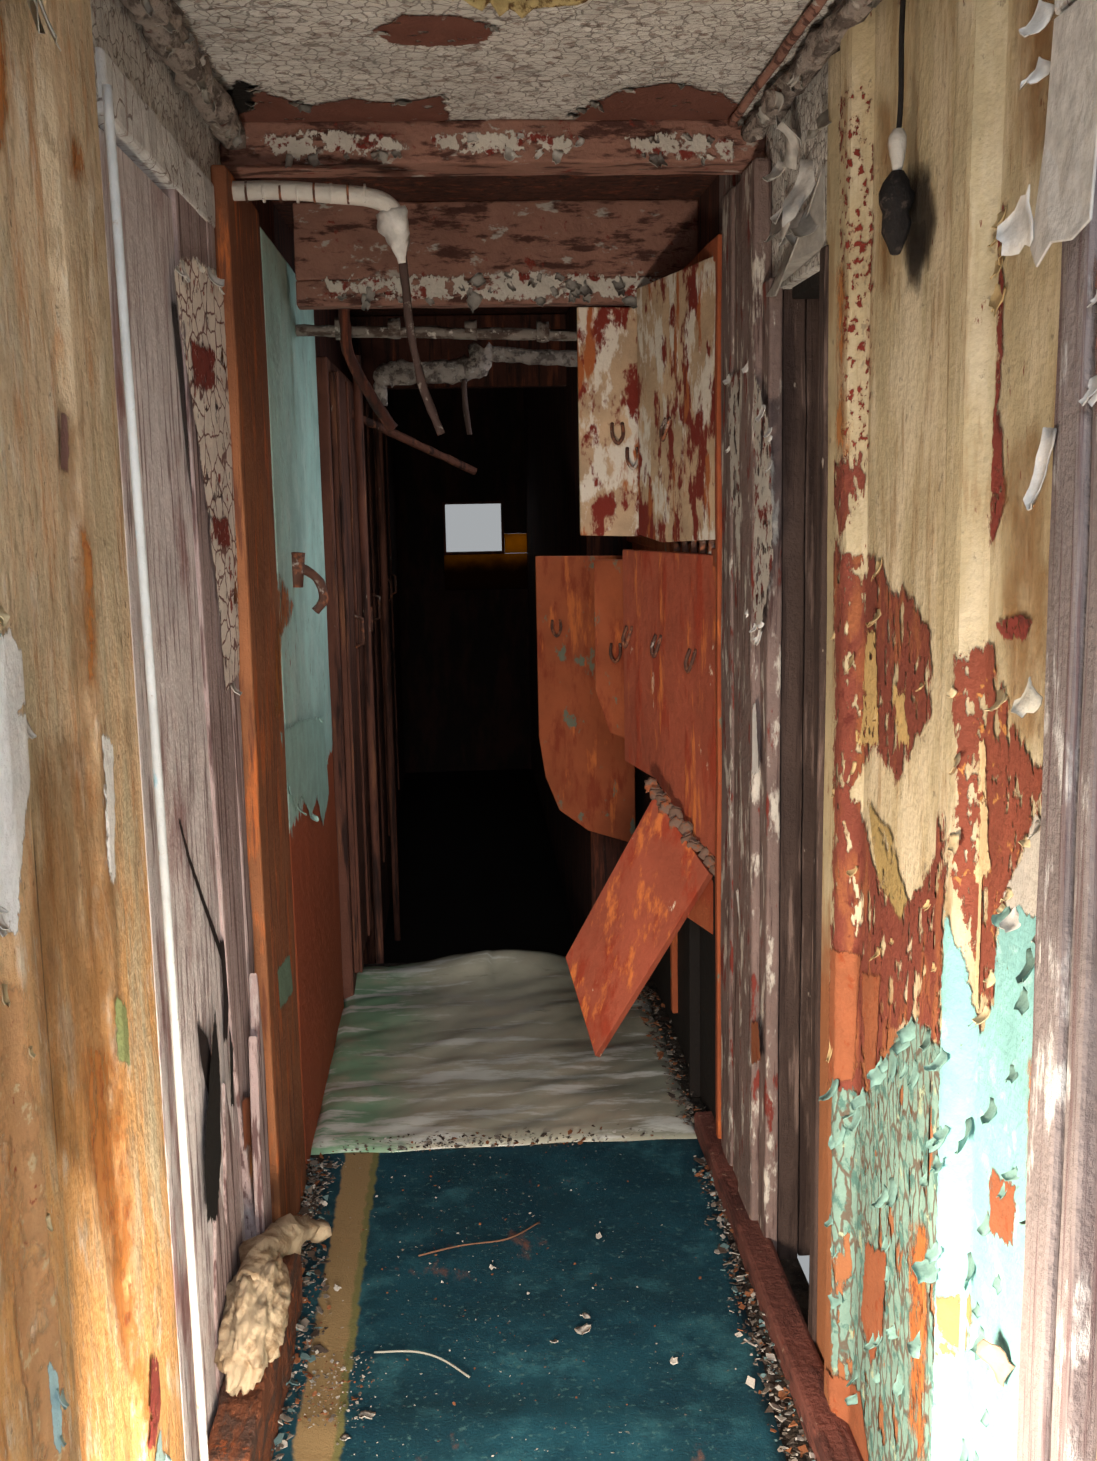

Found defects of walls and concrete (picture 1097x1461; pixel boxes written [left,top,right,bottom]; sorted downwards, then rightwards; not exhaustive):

rust [0,16,14,151]
rust [70,142,84,176]
peeling [996,0,1097,267]
peeling [322,269,661,312]
rust [987,203,1008,545]
rust [996,615,1032,642]
peeling [0,602,37,937]
peeling [280,716,329,826]
peeling [278,955,293,1009]
peeling [818,448,1043,1461]